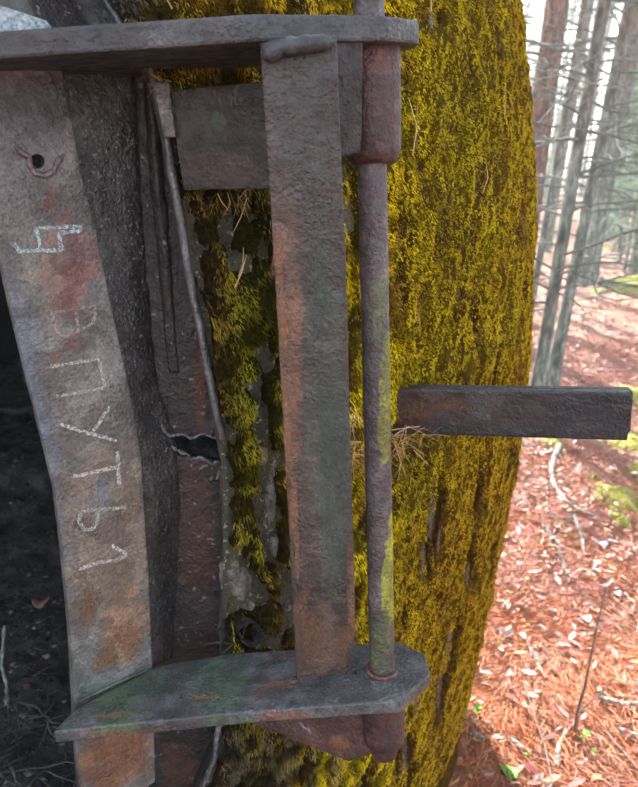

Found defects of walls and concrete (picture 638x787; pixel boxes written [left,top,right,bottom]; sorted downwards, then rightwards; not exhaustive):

corrosion [273,235,289,356]
crack [161,423,220,480]
corrosion [283,387,300,576]